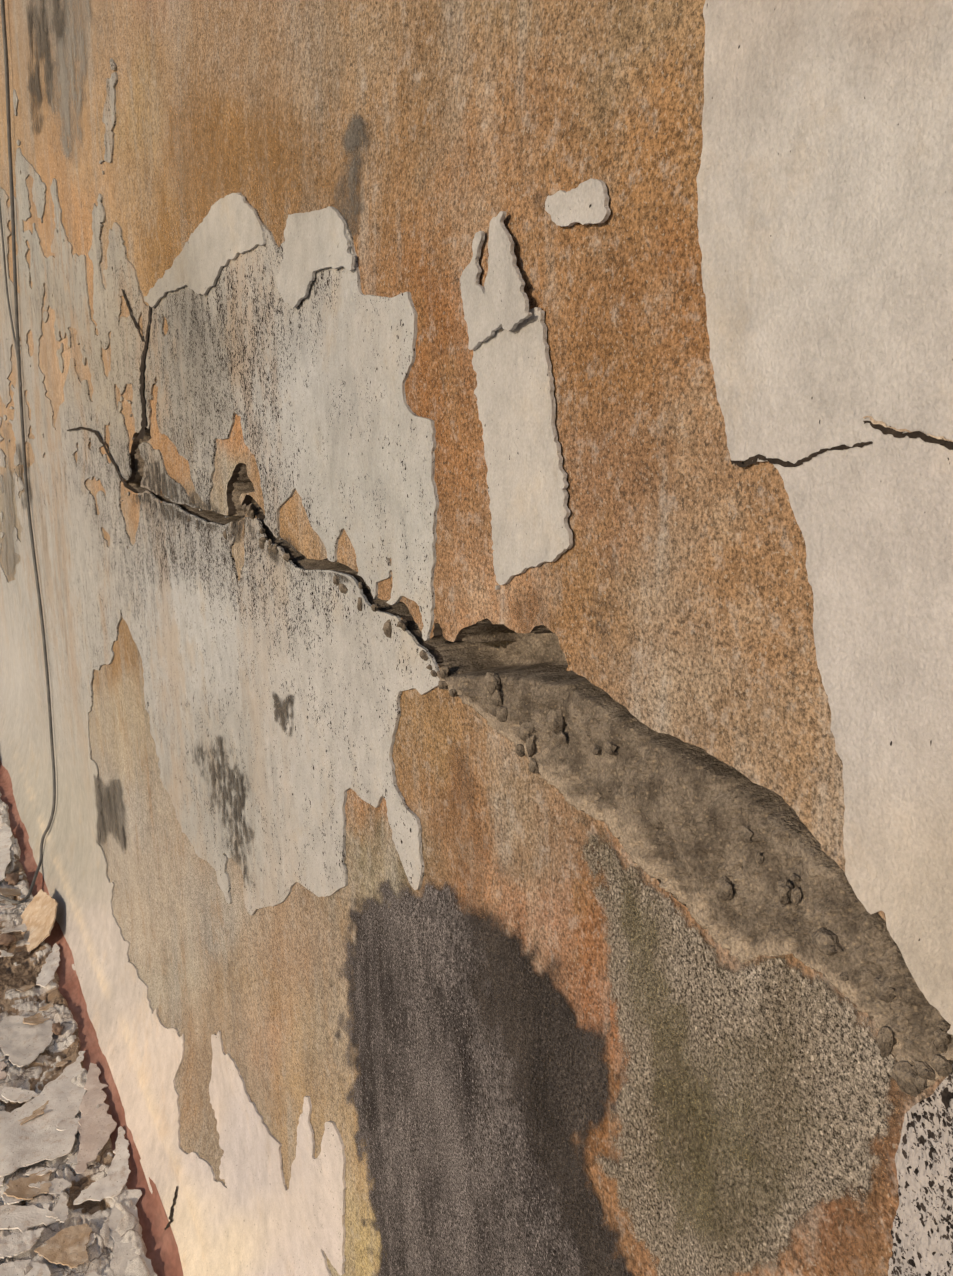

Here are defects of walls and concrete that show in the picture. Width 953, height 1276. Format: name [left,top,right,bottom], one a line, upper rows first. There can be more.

water stain [26,0,90,157]
peeling [0,0,846,871]
peeling [89,617,879,1276]
crack [67,289,953,1097]
water stain [335,836,896,1276]
peeling [717,1055,946,1276]